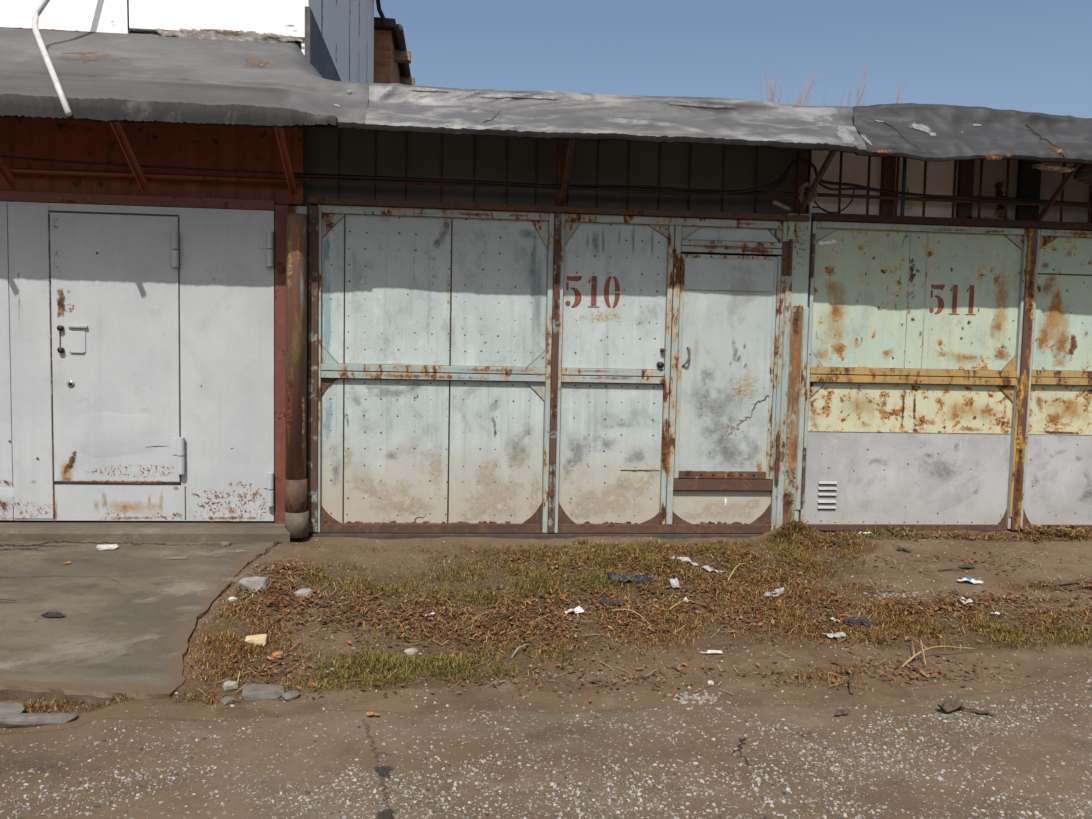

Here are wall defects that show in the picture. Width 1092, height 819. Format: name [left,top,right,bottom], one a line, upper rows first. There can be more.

corrosion [818,302,842,357]
corrosion [1026,253,1087,365]
crack [730,395,773,434]
corrosion [1037,389,1092,434]
corrosion [661,418,671,472]
corrosion [0,497,56,520]
corrosion [63,451,173,484]
corrosion [104,501,182,520]
corrosion [193,481,266,523]
corrosion [783,492,793,519]
corrosion [1014,443,1023,520]